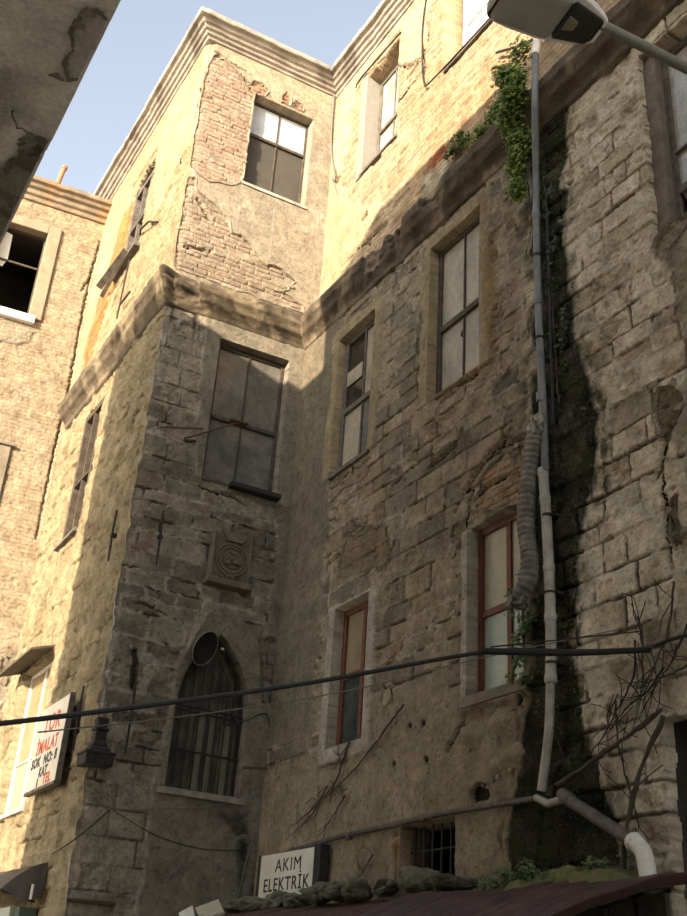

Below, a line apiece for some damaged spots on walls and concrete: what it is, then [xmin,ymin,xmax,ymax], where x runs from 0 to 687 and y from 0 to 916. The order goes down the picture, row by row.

peeling [48,7,107,82]
spalling [0,133,49,237]
spalling [174,53,305,313]
peeling [0,317,36,345]
spalling [470,442,524,512]
leakage [497,108,634,887]